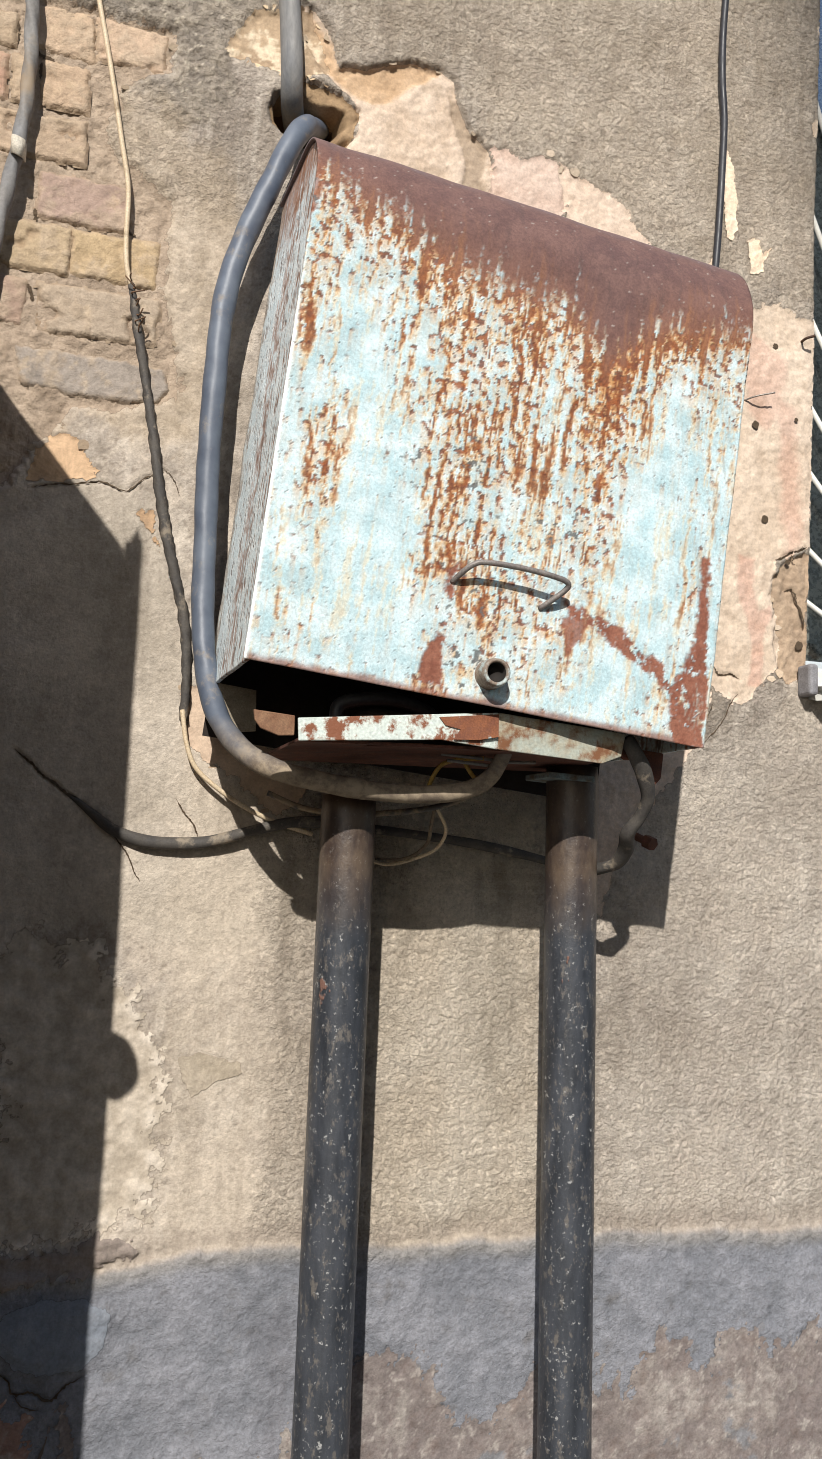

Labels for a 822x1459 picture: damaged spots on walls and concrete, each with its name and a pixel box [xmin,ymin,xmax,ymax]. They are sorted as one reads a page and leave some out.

flaking render [225,4,281,76]
spalling [269,95,285,134]
flaking render [301,5,651,245]
flaking render [0,0,186,487]
spalling [724,151,772,274]
flaking render [709,302,814,705]
flaking render [597,749,692,918]
flaking render [0,913,242,1294]
peeling [278,1422,292,1459]
peeling [349,1342,538,1459]